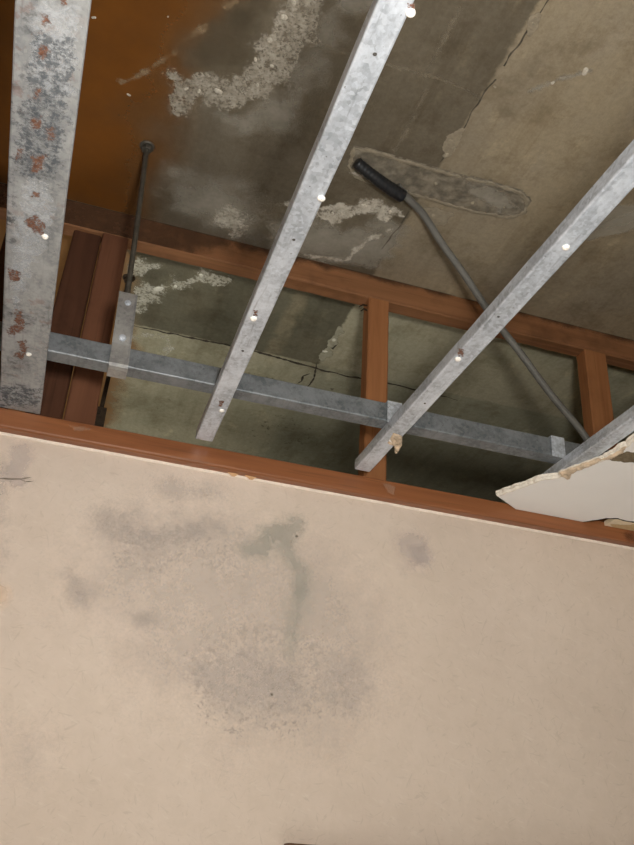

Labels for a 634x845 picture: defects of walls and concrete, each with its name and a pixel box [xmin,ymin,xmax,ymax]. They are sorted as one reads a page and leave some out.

damp [135,0,335,133]
rust [0,0,231,218]
rust [24,215,46,235]
rust [54,234,73,303]
damp [64,181,270,254]
damp [134,258,231,314]
damp [295,198,454,296]
rust [7,309,29,360]
crack [135,326,231,347]
crack [254,350,361,386]
spalling [319,326,344,361]
spalling [496,433,634,496]